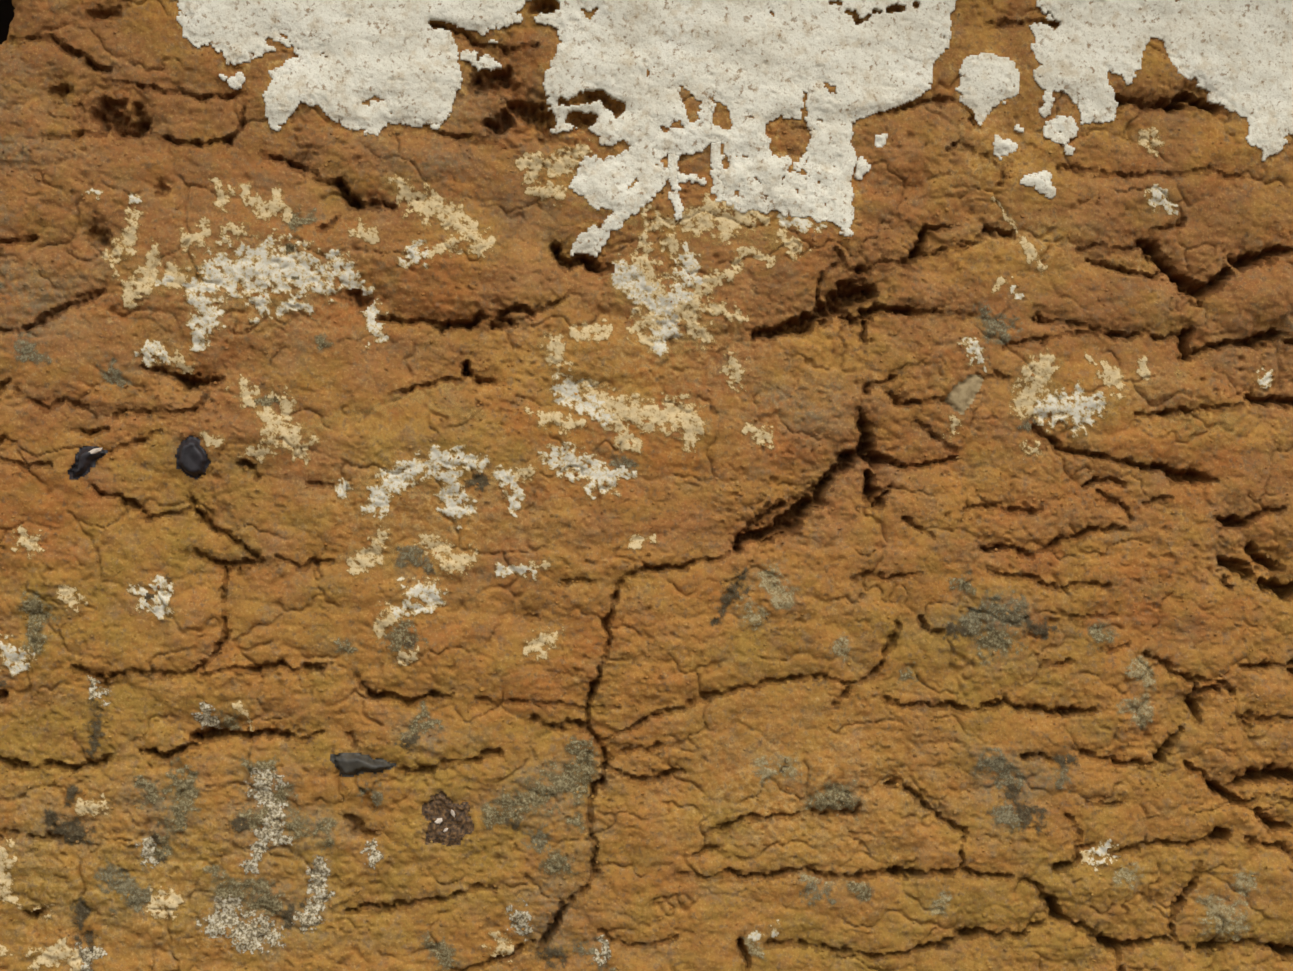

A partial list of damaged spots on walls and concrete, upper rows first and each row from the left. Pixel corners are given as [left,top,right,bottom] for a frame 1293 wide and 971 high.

crack [9,33,398,233]
peeling [219,72,245,90]
peeling [397,182,497,269]
peeling [460,39,502,72]
crack [375,239,615,396]
peeling [515,138,593,207]
crack [749,222,1016,345]
peeling [993,124,1024,160]
peeling [1020,170,1056,199]
crack [975,217,1293,381]
crack [70,374,1099,971]
crack [674,421,1293,971]